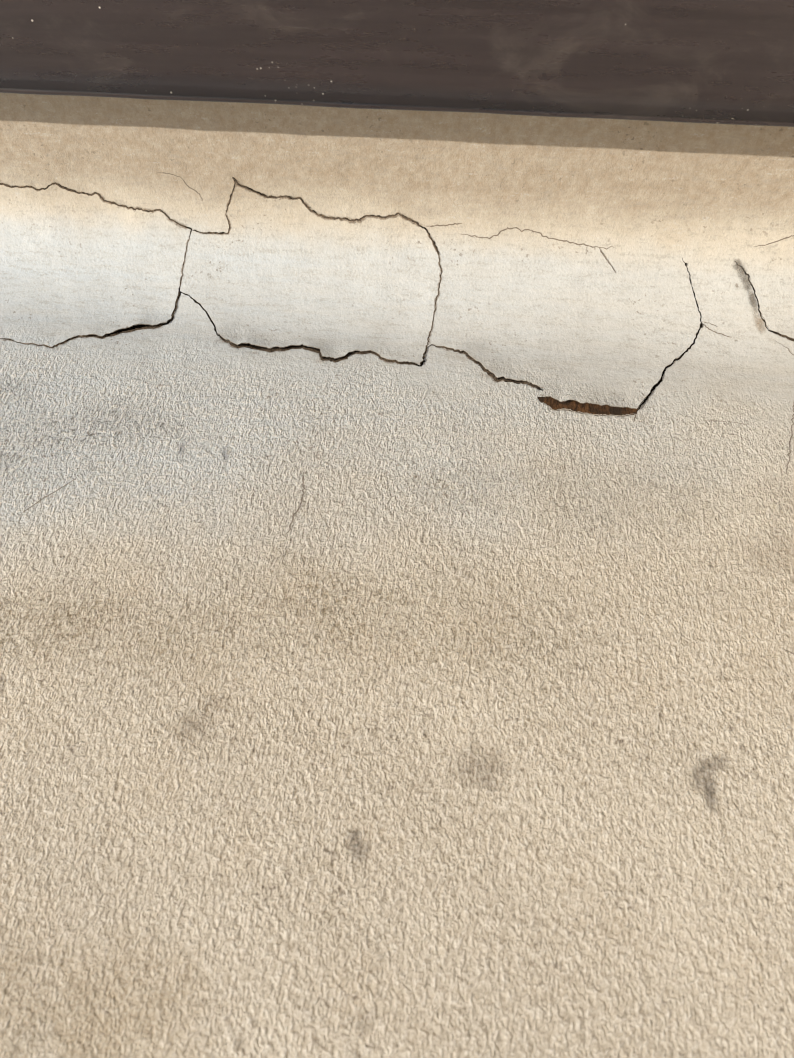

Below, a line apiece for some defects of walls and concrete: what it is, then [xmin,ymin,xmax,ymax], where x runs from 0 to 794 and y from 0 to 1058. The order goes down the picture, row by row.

crack [0,177,616,391]
crack [634,258,732,421]
crack [734,235,794,355]
crack [786,402,794,473]